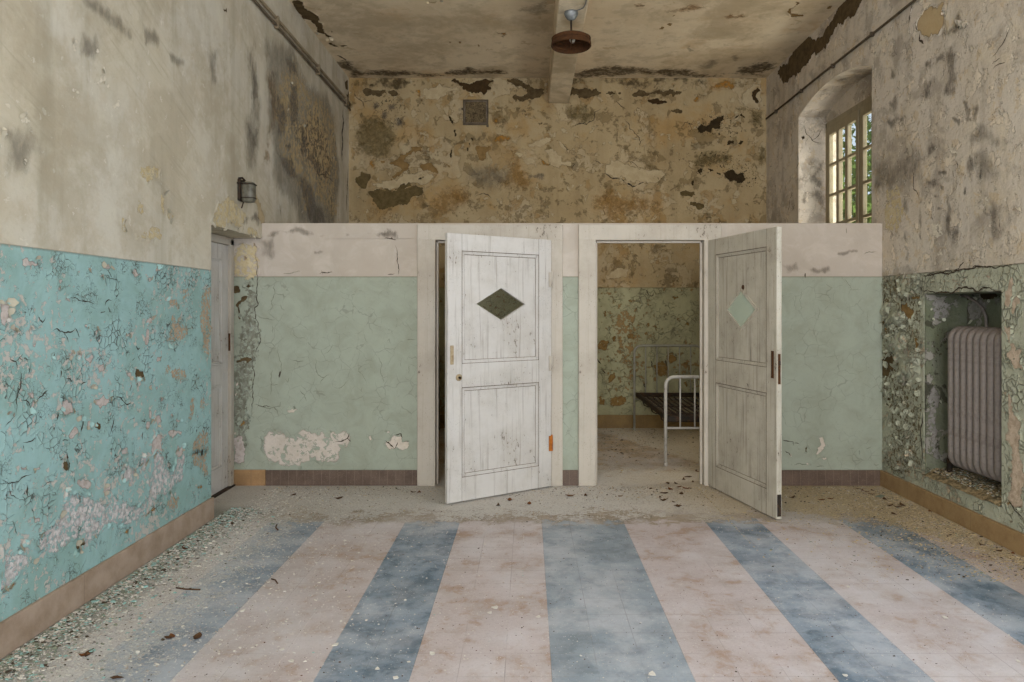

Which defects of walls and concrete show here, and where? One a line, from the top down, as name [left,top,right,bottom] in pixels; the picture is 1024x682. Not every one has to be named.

flaking render [290,0,347,48]
flaking render [778,0,868,87]
peeling [907,0,946,38]
damp [269,80,331,177]
flaking render [423,78,544,104]
flaking render [570,86,682,113]
flaking render [355,145,440,212]
flaking render [679,190,704,211]
peeling [210,194,350,470]
peeling [597,321,652,352]
peeling [880,271,951,476]
peeling [0,288,213,594]